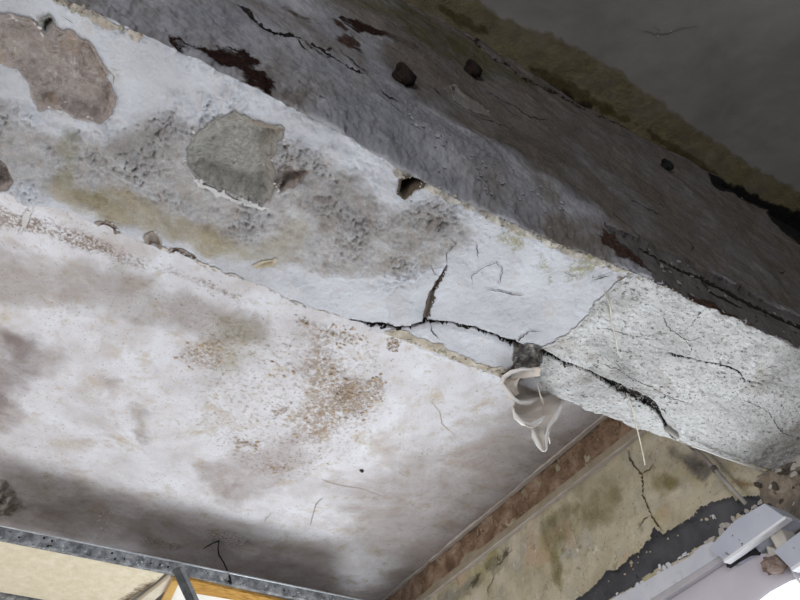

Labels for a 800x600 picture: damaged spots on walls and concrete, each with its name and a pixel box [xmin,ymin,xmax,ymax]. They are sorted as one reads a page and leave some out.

flaking render [0,13,118,124]
flaking render [52,0,144,43]
rust [169,34,275,96]
rust [333,16,397,52]
flaking render [184,109,307,210]
damp [0,215,108,252]
crack [351,238,688,426]
flaking render [383,2,800,600]
crack [639,248,800,329]
crack [663,312,793,437]
crack [628,451,661,529]
damp [686,457,709,477]